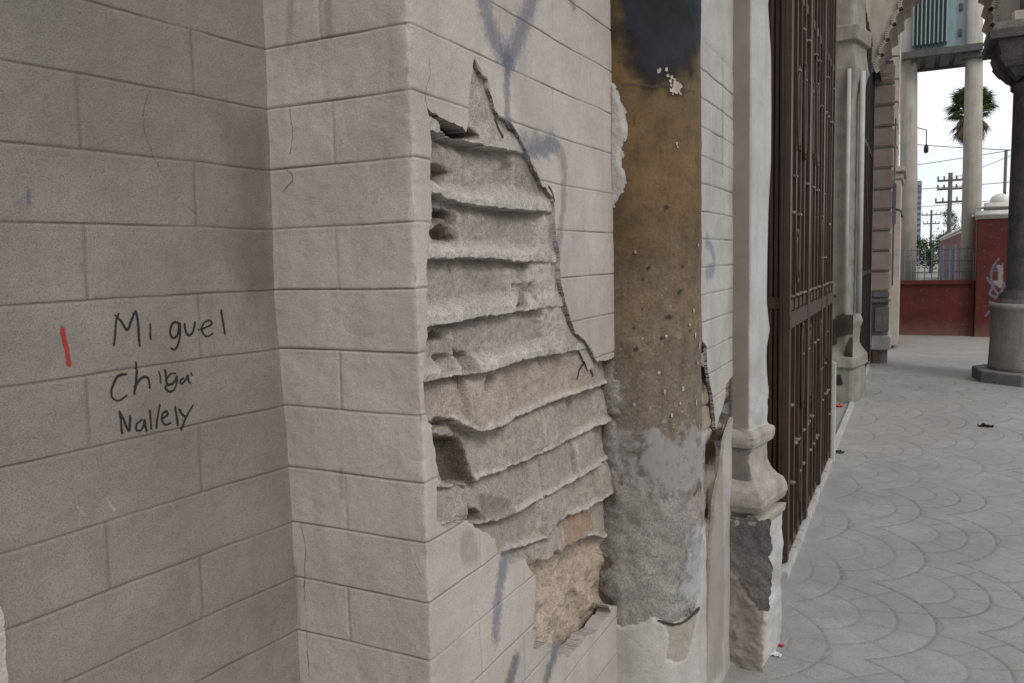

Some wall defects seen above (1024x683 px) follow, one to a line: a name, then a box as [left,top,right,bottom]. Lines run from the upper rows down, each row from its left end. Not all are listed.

flaking render [423,59,615,658]
flaking render [729,566,765,673]